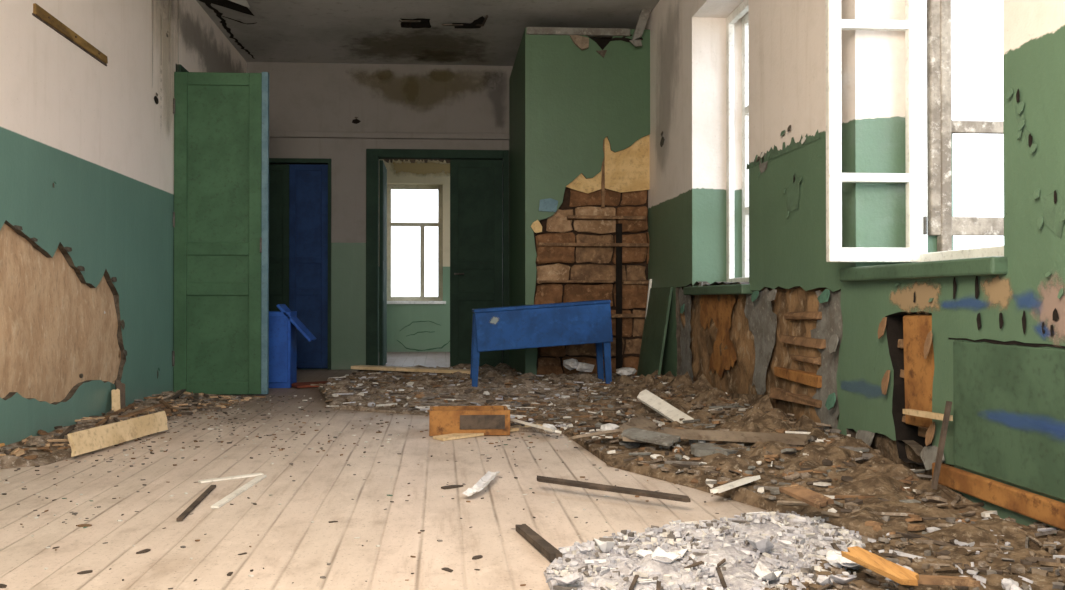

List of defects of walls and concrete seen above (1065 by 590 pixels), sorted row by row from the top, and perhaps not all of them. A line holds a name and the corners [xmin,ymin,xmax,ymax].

crack [199,0,255,59]
spalling [0,223,127,404]
spalling [531,131,663,379]
spalling [679,282,843,433]
spalling [854,283,954,481]
peeling [975,275,1012,329]
peeling [1022,271,1065,343]